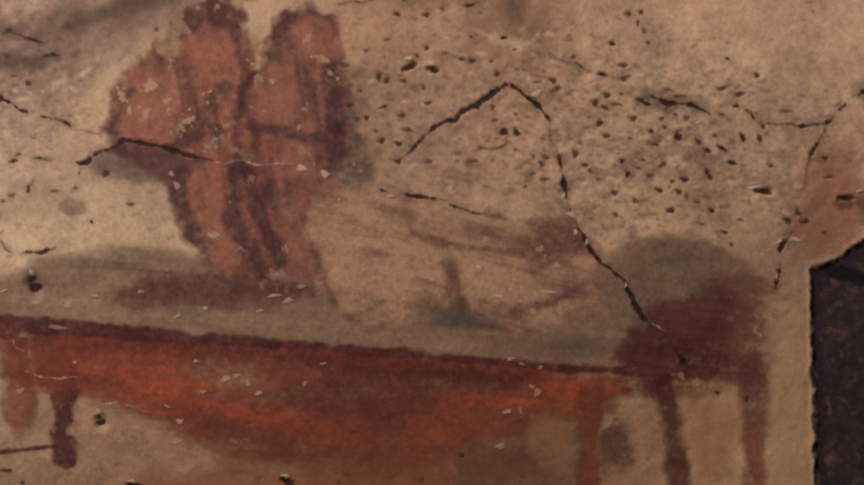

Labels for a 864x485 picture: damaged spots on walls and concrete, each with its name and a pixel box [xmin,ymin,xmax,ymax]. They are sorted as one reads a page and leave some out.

crack [0,96,71,127]
crack [399,83,550,160]
crack [768,90,864,160]
crack [76,138,211,165]
crack [298,165,328,177]
crack [380,189,480,214]
crack [25,247,52,255]
crack [558,156,648,322]
crack [775,238,799,287]